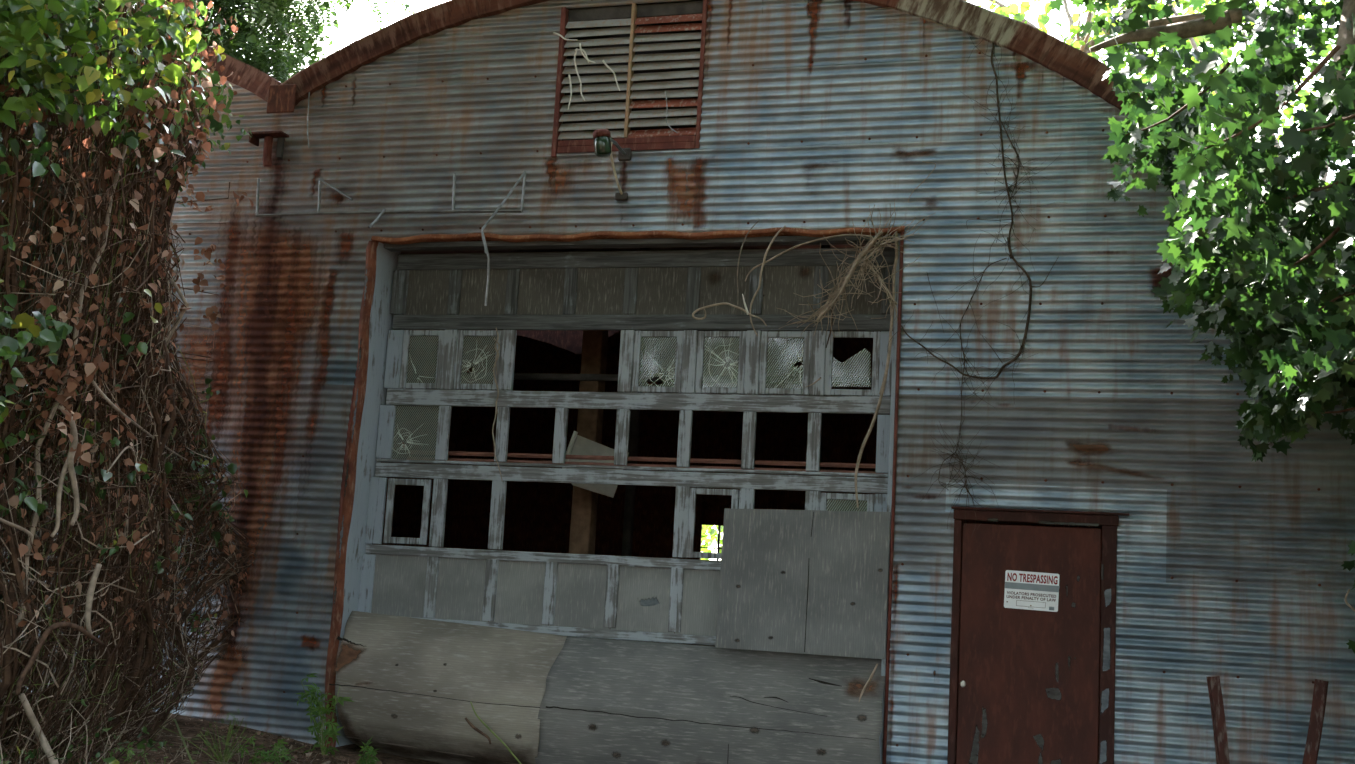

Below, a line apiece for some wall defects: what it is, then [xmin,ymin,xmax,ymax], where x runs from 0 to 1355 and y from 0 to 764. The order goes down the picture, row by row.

corrosion [807,0,822,73]
corrosion [668,158,706,227]
corrosion [181,152,353,717]
corrosion [1067,442,1153,478]